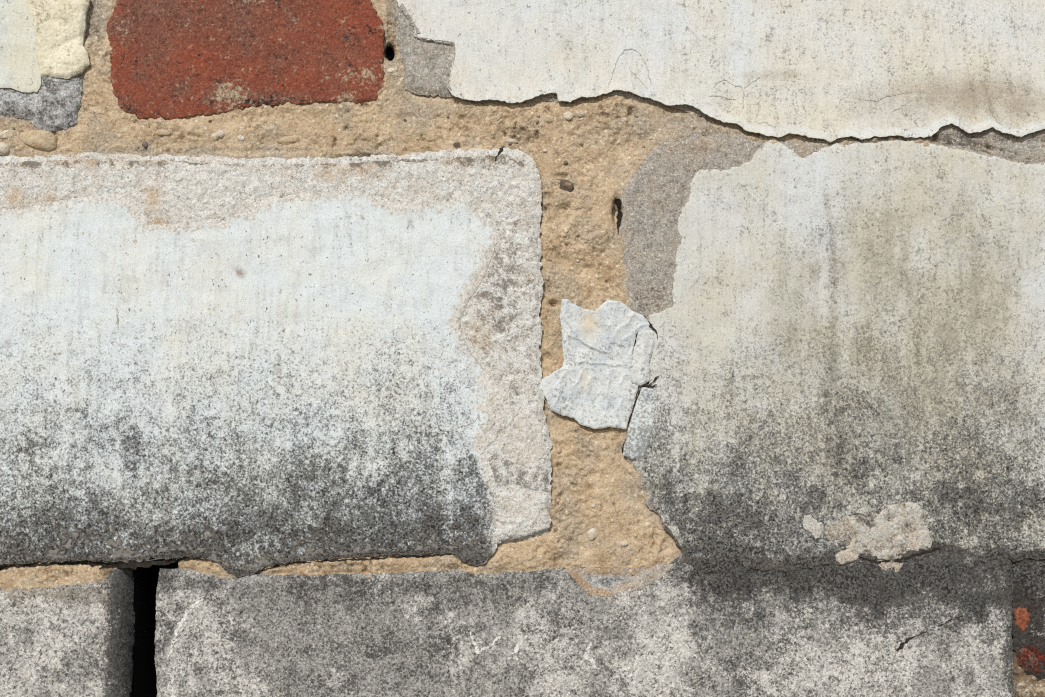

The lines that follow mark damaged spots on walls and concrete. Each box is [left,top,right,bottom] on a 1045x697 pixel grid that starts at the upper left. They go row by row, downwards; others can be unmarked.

spalling [0,0,1045,545]
mould [0,345,545,615]
leakage [638,345,1045,635]
peeling [803,500,933,572]